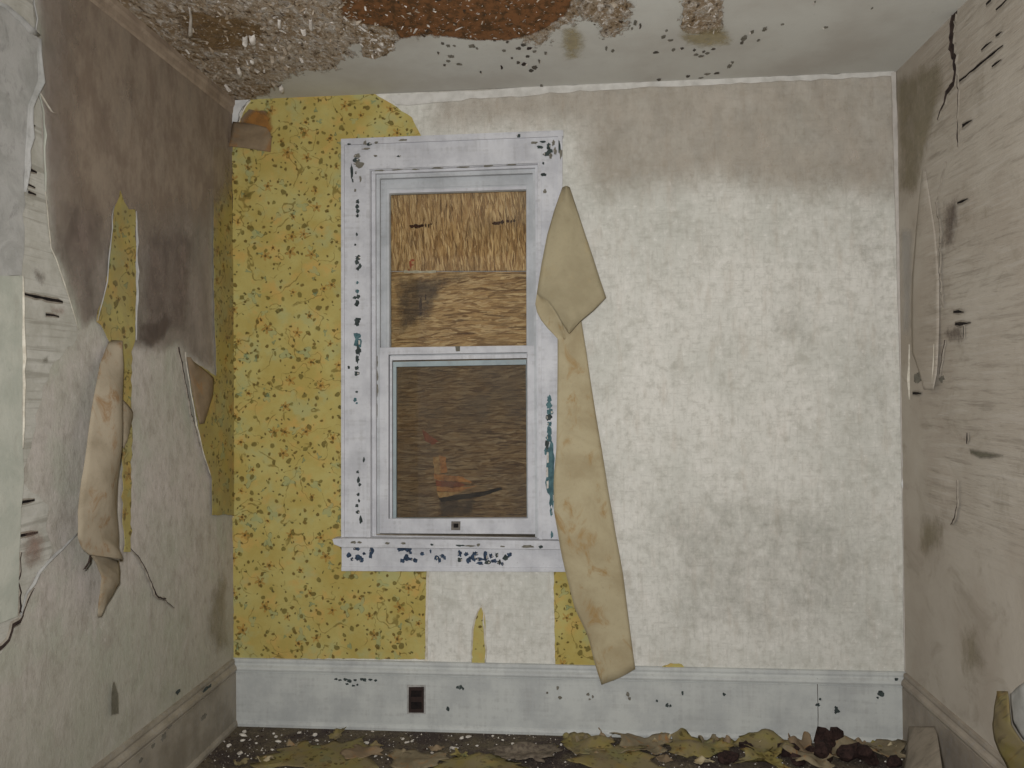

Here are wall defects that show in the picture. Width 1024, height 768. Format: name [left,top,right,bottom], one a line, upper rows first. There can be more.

water stain [179,12,263,50]
peeling [117,0,478,152]
peeling [493,0,642,72]
peeling [653,0,724,58]
crack [937,8,960,147]
water stain [44,0,233,363]
peeling [10,92,78,467]
peeling [347,232,362,376]
peeling [387,61,945,681]
peeling [0,484,52,655]
crack [131,549,174,608]
peeling [346,531,553,566]